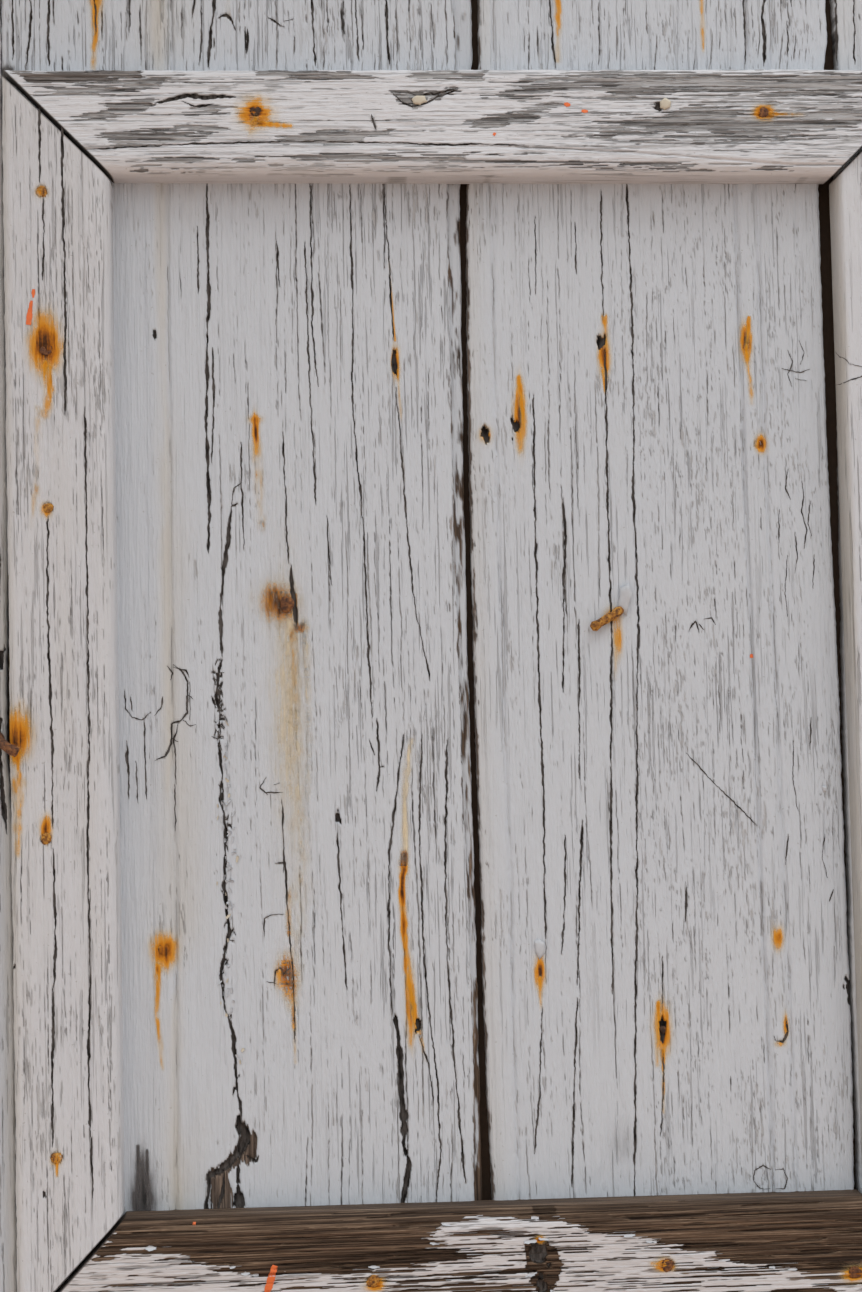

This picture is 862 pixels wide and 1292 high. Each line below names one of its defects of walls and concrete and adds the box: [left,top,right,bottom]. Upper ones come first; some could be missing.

corrosion [239,98,292,128]
peeling [12,70,712,172]
peeling [389,70,862,145]
corrosion [29,313,63,414]
corrosion [514,375,526,448]
corrosion [740,316,752,395]
crack [38,105,94,1198]
crack [124,184,296,1209]
corrosion [398,740,424,1047]
corrosion [153,935,176,1039]
corrosion [655,1001,670,1093]
peeling [90,1123,862,1292]